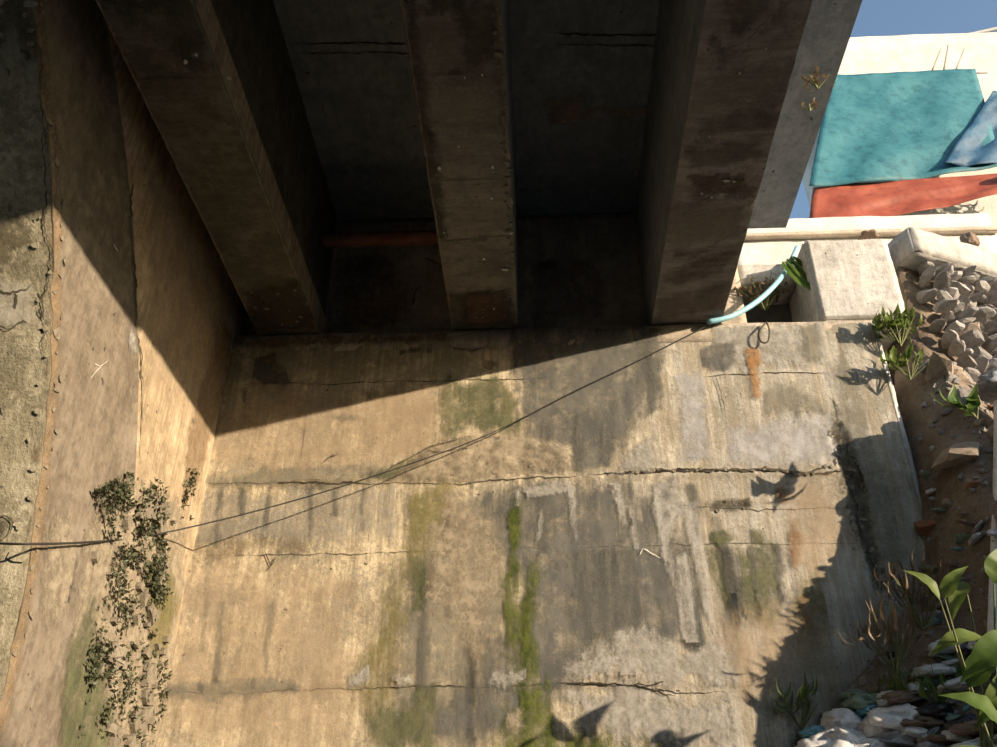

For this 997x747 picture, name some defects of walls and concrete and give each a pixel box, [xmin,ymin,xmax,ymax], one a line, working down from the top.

crack [305,42,408,55]
crack [554,32,656,47]
spalling [0,0,67,735]
damp [676,323,829,459]
rust [745,348,761,397]
crack [210,372,883,593]
damp [391,290,740,747]
damp [729,359,903,590]
crack [181,685,488,695]
crack [562,681,730,696]